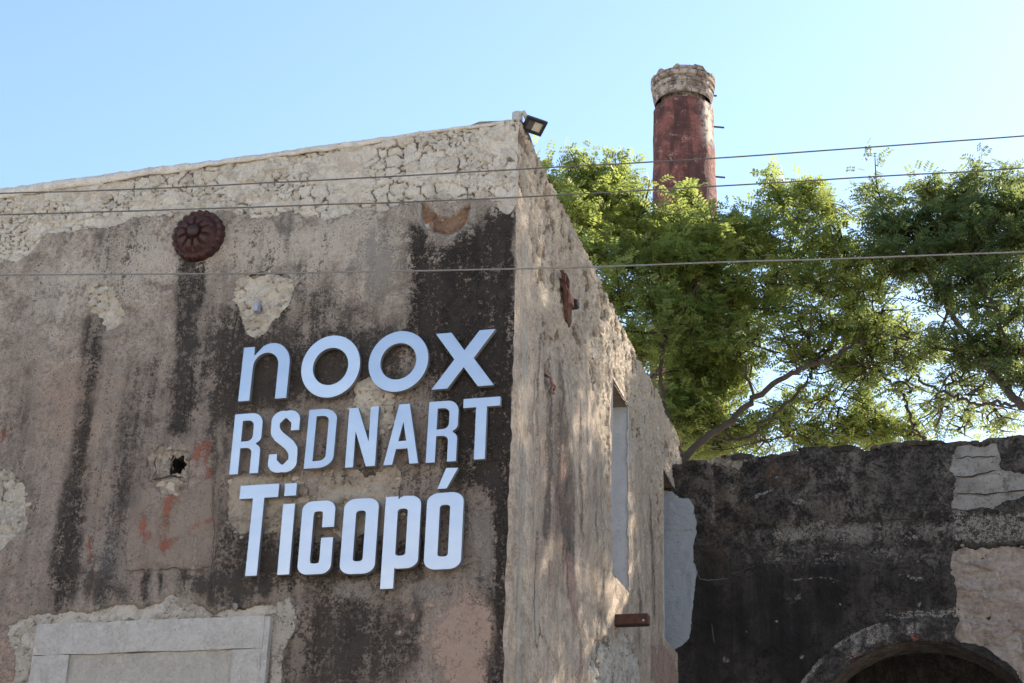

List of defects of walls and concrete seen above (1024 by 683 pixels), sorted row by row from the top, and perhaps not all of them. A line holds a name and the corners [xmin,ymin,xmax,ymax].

flaking render [0,119,682,562]
leakage [50,316,163,613]
flaking render [0,594,278,683]
leakage [168,209,606,683]
leakage [762,509,1024,581]
leakage [886,607,956,619]
flaking render [949,443,1024,510]
flaking render [950,544,1024,683]